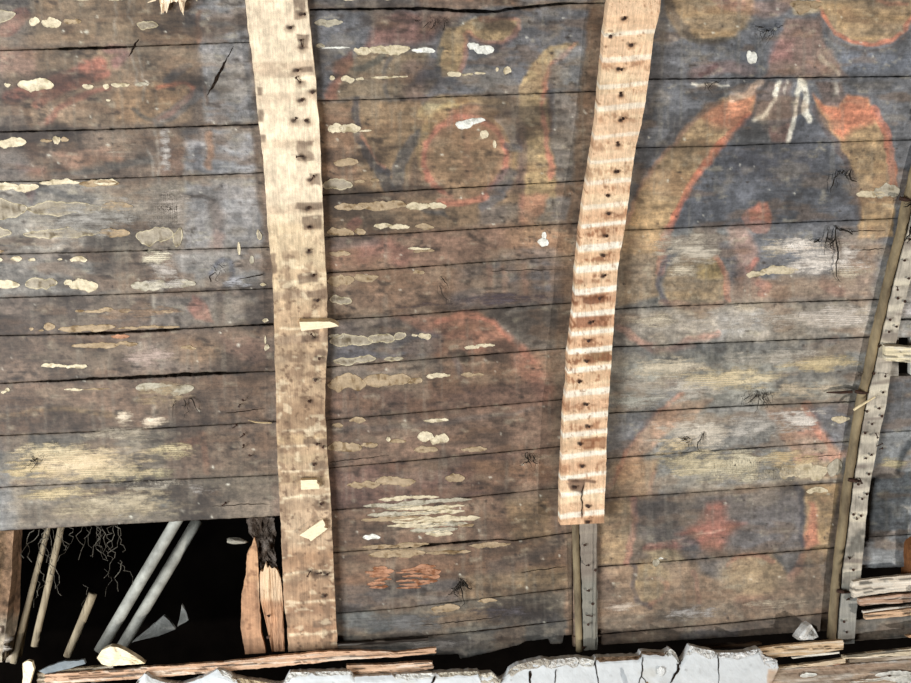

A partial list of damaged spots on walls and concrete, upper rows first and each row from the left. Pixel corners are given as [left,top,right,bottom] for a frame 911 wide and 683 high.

peeling [316,43,435,56]
peeling [467,42,494,55]
peeling [4,78,54,92]
peeling [0,137,26,149]
peeling [0,178,133,238]
peeling [335,200,447,211]
peeling [0,277,98,293]
peeling [327,332,450,393]
peeling [414,418,449,453]
peeling [347,476,511,589]
flaking render [392,646,778,683]
crack [670,660,681,683]